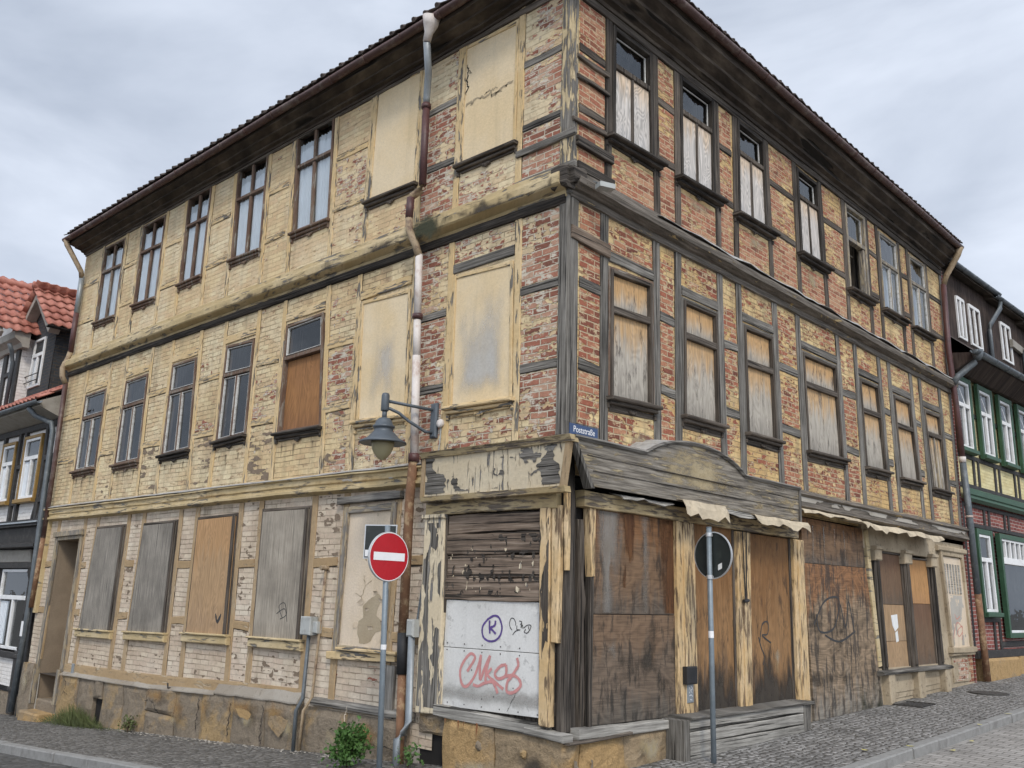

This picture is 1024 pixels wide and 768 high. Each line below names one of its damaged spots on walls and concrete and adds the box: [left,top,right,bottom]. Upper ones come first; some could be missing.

crack [465,65,513,107]
peeling [332,138,406,246]
spalling [247,372,277,480]
peeling [318,287,406,482]
peeling [418,206,560,495]
flaking render [352,591,398,644]
peeling [401,504,549,720]